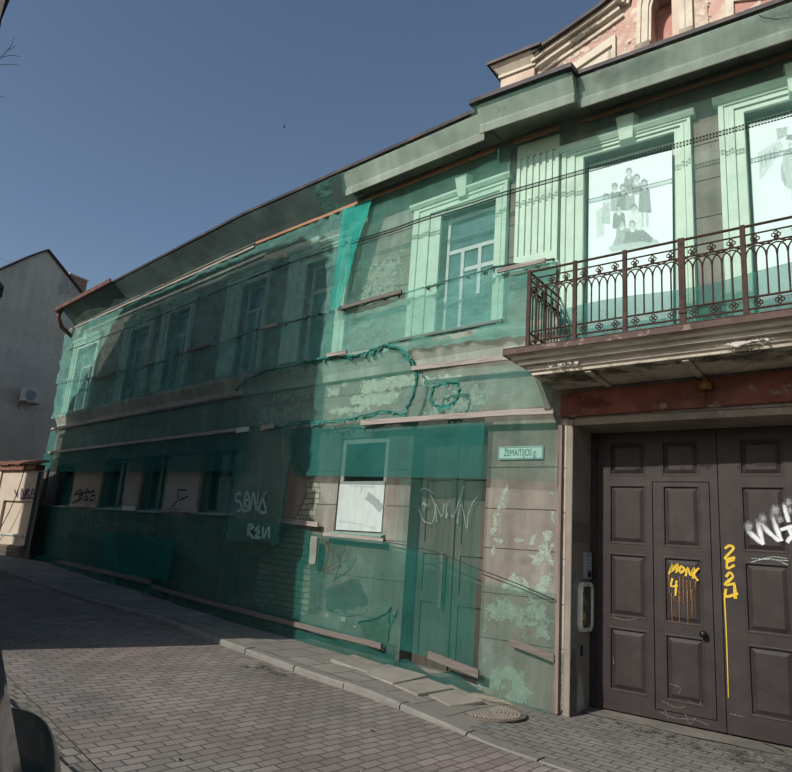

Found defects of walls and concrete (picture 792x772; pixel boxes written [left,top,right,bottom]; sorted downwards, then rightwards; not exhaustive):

peeling [617,14,637,56]
peeling [693,0,711,28]
peeling [329,373,493,416]
peeling [489,482,556,566]